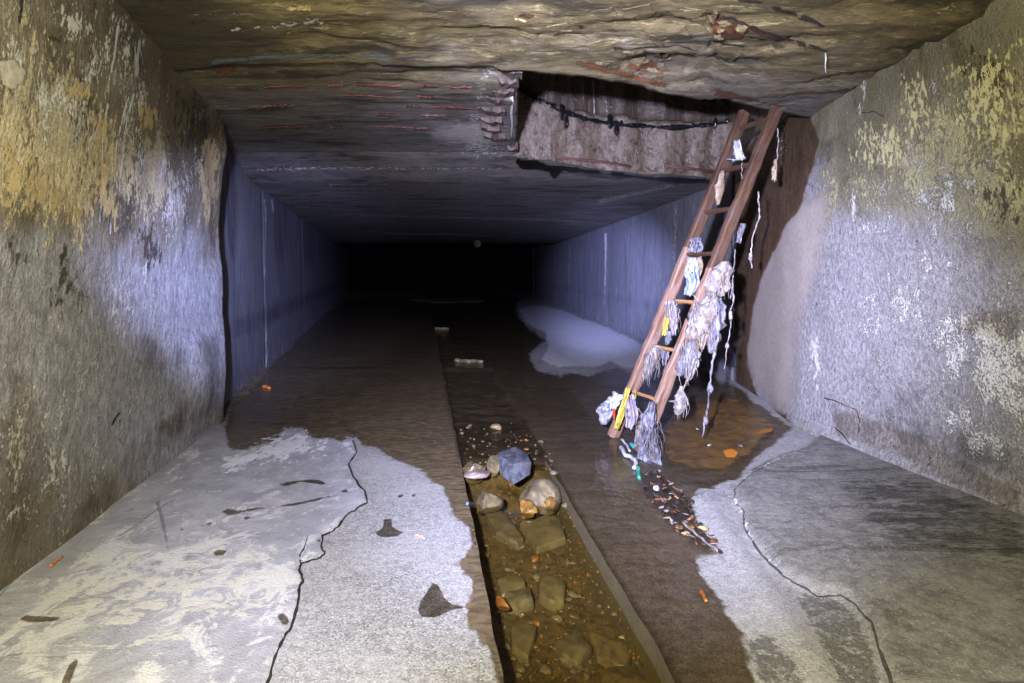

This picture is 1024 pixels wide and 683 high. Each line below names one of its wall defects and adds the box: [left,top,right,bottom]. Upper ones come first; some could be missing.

water stain [53,2,98,45]
efflorescence [231,14,323,32]
water stain [0,25,158,235]
water stain [154,125,227,231]
spalling [555,156,631,168]
water stain [850,184,887,240]
water stain [848,71,937,169]
water stain [943,38,1024,154]
crack [266,440,368,683]
crack [734,450,893,683]